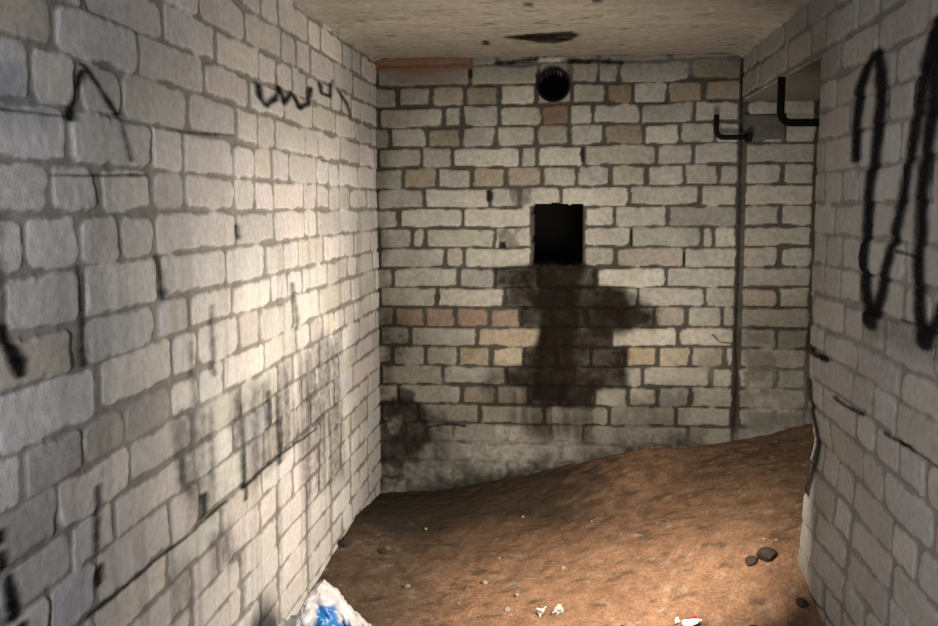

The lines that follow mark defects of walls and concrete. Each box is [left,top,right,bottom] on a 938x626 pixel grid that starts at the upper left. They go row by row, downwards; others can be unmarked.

water stain [536,267,581,410]